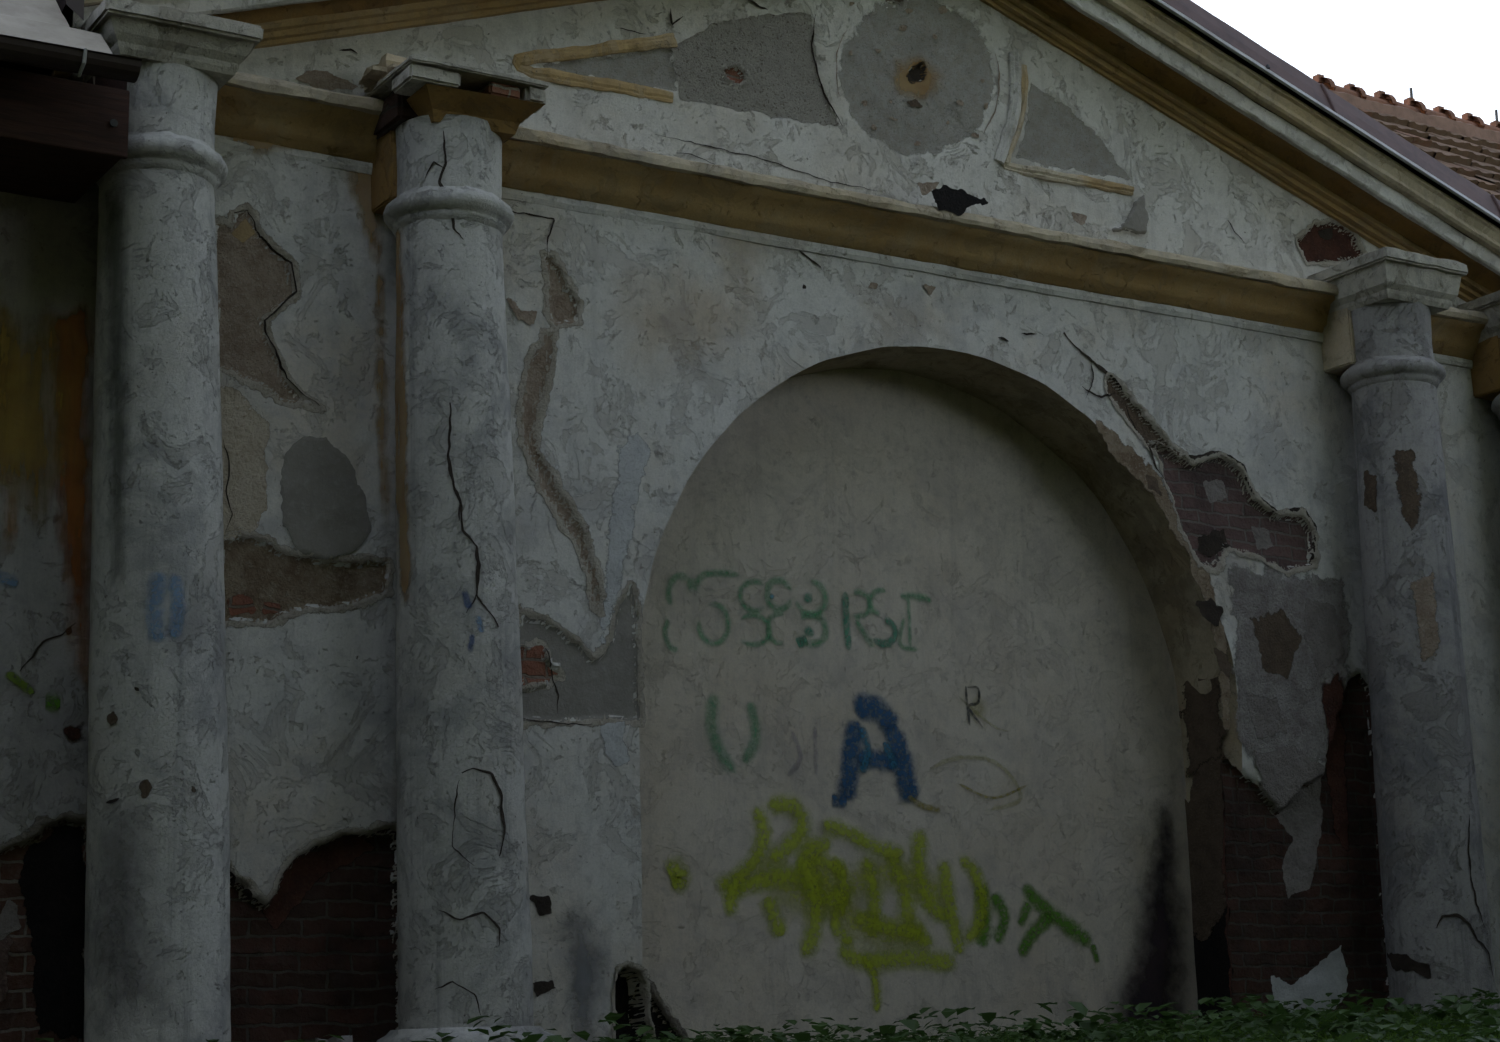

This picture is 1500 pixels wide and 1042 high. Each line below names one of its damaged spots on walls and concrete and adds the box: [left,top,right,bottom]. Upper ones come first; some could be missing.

peeling [671,0,842,126]
peeling [215,202,396,629]
crack [447,402,499,627]
flaking render [506,211,646,730]
crack [1064,332,1317,560]
flaking render [0,811,87,1042]
crack [63,722,83,742]
flaking render [230,820,398,1042]
crack [439,910,501,945]
crack [452,768,506,865]
damp [1108,821,1182,1035]
flaking render [1096,420,1391,1022]